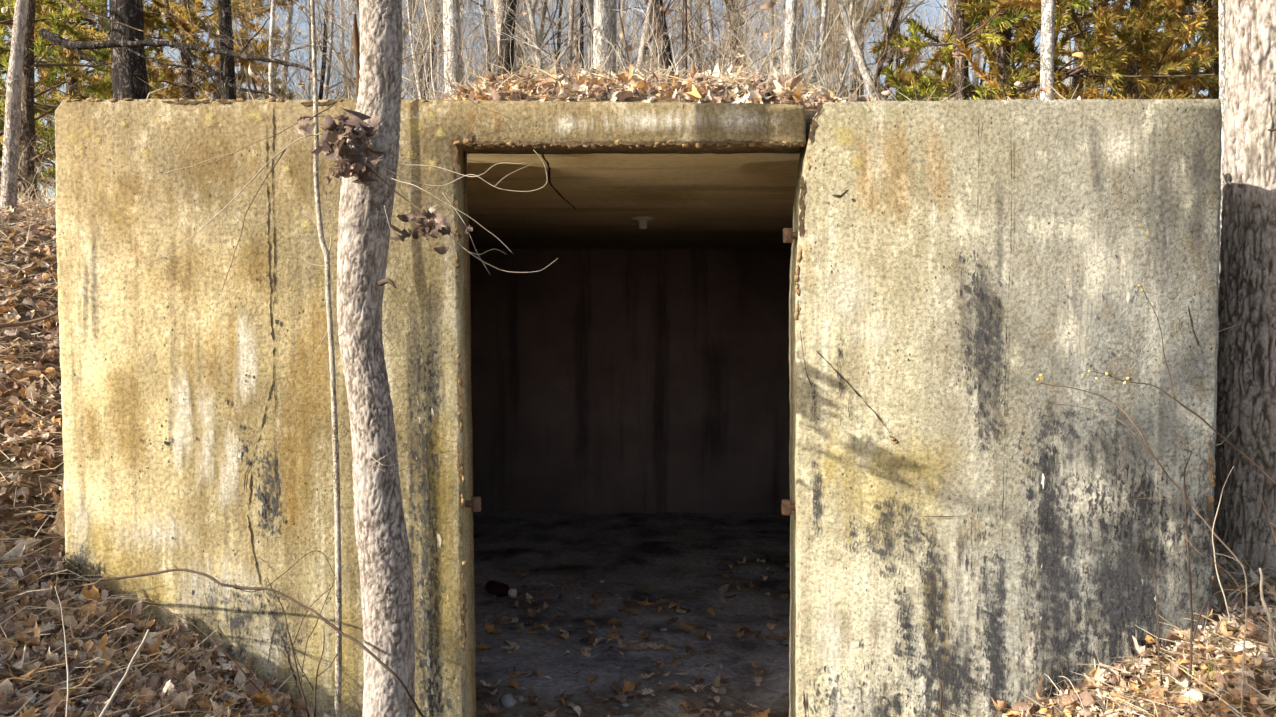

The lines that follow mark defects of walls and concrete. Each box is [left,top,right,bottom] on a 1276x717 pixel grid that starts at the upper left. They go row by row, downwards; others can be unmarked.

crack [240,106,301,696]
damp [75,495,88,553]
damp [1060,460,1127,537]
damp [1150,492,1183,573]
damp [189,563,254,612]
damp [950,538,977,626]
damp [261,623,278,673]
damp [1105,630,1141,657]
damp [837,685,872,717]